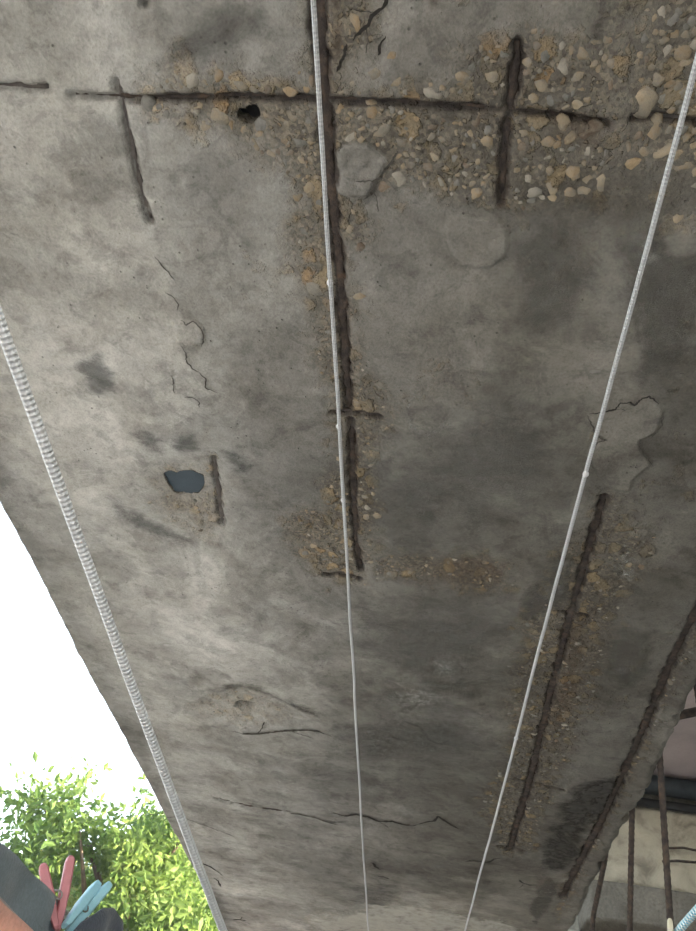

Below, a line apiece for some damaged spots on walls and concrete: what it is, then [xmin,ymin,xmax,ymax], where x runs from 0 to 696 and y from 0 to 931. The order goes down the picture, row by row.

crack [336,0,388,72]
crack [155,257,217,406]
spalling [0,0,696,596]
damp [624,236,696,380]
spalling [463,395,685,860]
spalling [179,683,317,732]
crack [287,811,461,830]